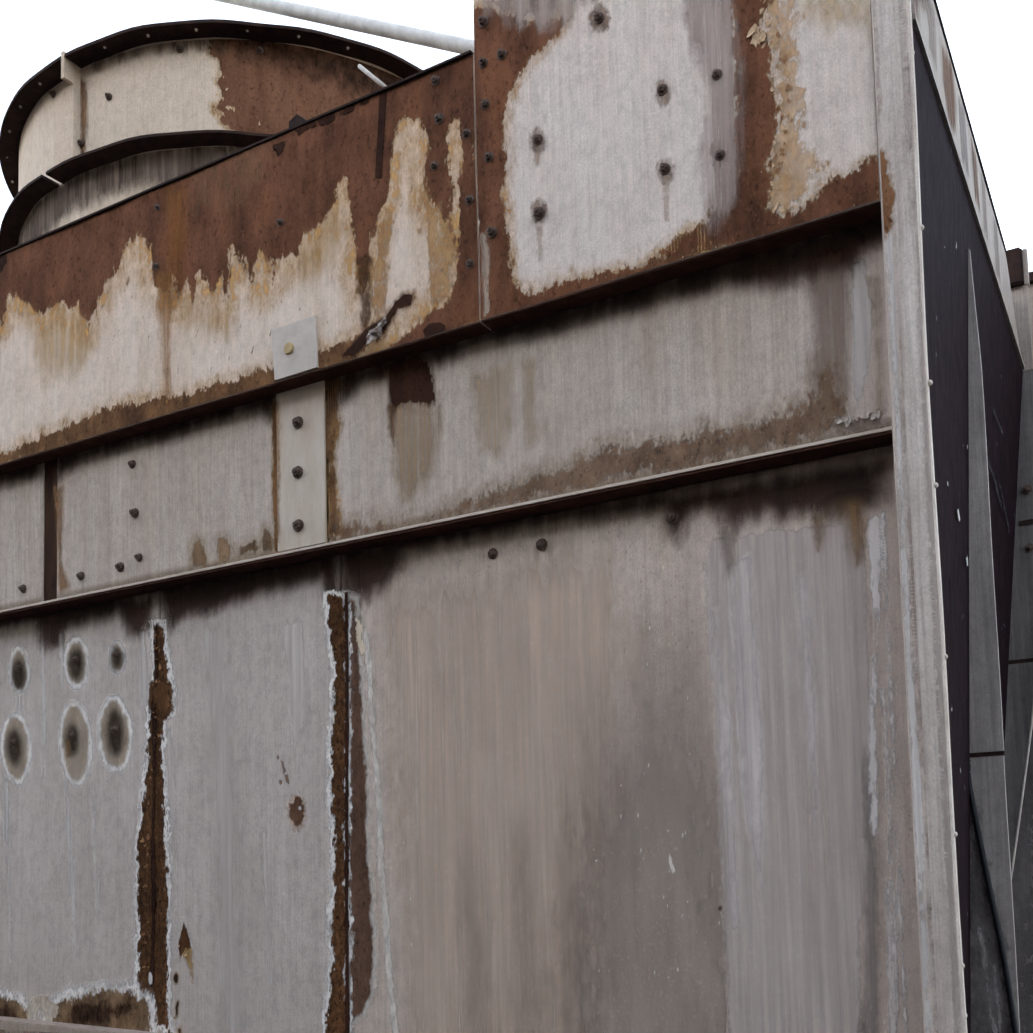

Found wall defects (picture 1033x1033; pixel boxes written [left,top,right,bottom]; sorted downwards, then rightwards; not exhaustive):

corrosion [0,0,895,592]
peeling [746,0,829,215]
leakage [812,259,872,404]
leakage [885,228,905,494]
leakage [355,618,399,1033]
corrosion [0,461,885,1033]
leakage [390,512,907,1033]
leakage [901,514,933,1033]